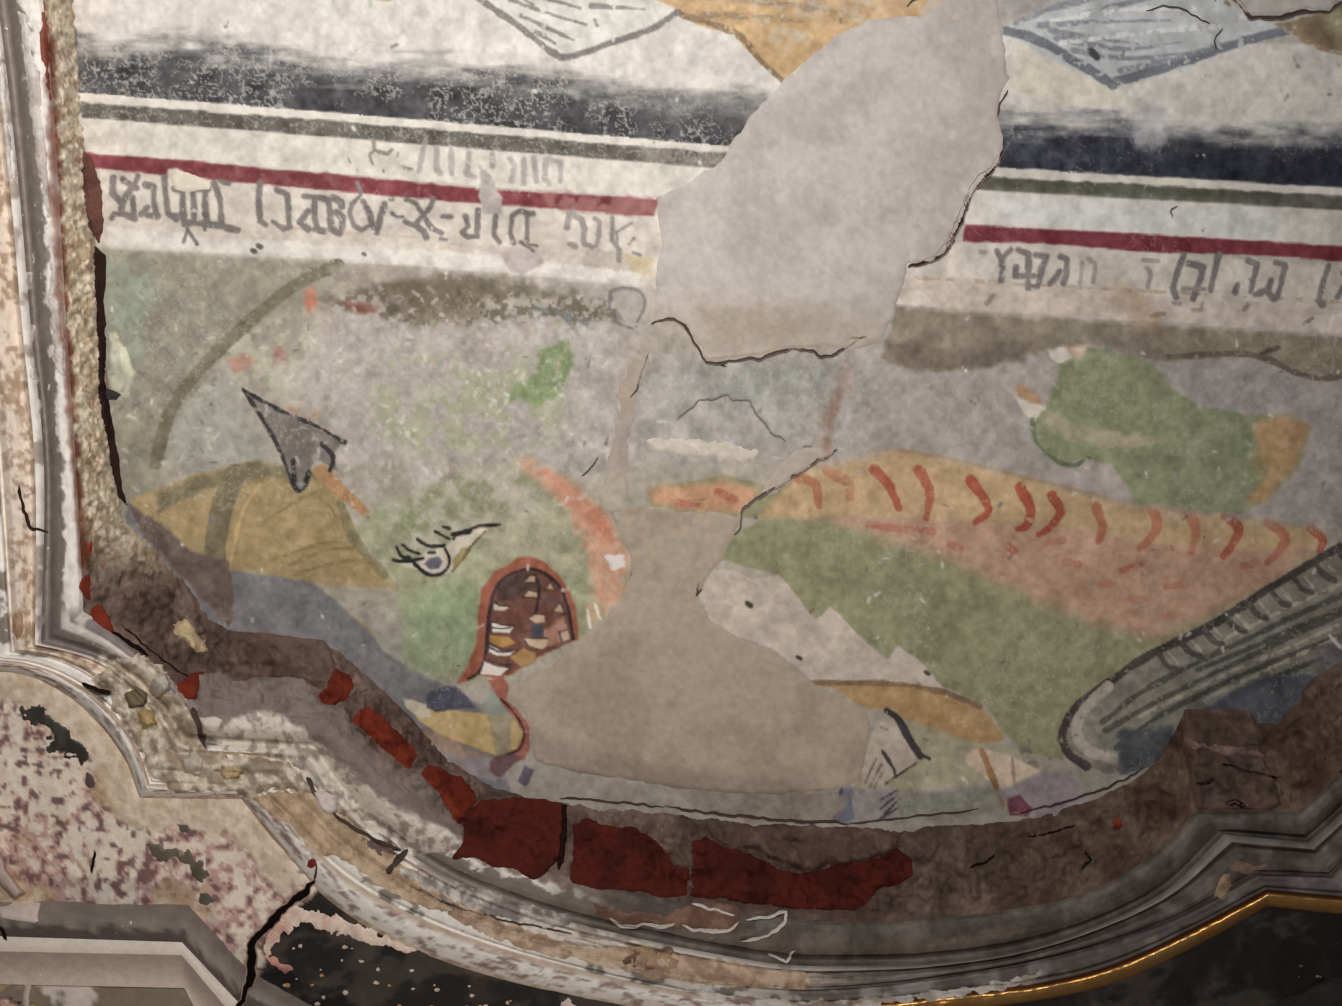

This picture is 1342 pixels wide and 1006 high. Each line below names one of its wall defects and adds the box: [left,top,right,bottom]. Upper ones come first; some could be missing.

peeling [0,51,19,185]
peeling [17,11,51,219]
peeling [28,261,66,417]
flaking render [81,151,127,505]
flaking render [79,574,114,632]
flaking render [173,619,208,652]
flaking render [0,851,26,901]
flaking render [0,984,32,1006]
crack [235,864,317,1006]
flaking render [82,653,1044,1006]